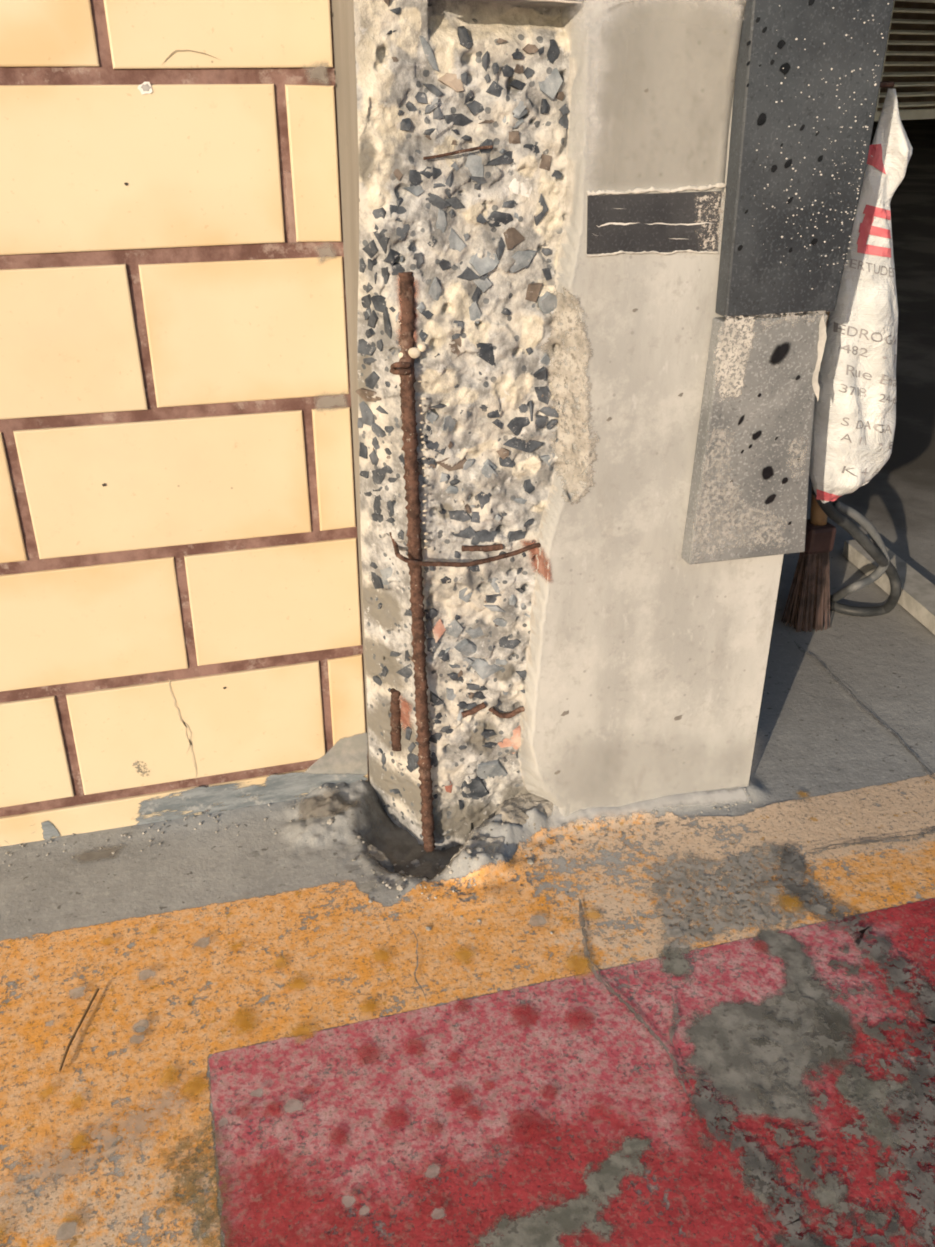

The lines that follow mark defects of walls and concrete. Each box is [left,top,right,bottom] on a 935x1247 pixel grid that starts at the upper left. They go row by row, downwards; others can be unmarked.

spalling [354,0,612,861]
rust [390,272,436,852]
rust [523,541,551,582]
crack [169,680,197,775]
crack [794,641,935,779]
spalling [366,845,395,873]
peeling [642,842,935,1247]
crack [739,829,935,1247]
peeling [474,1136,652,1247]